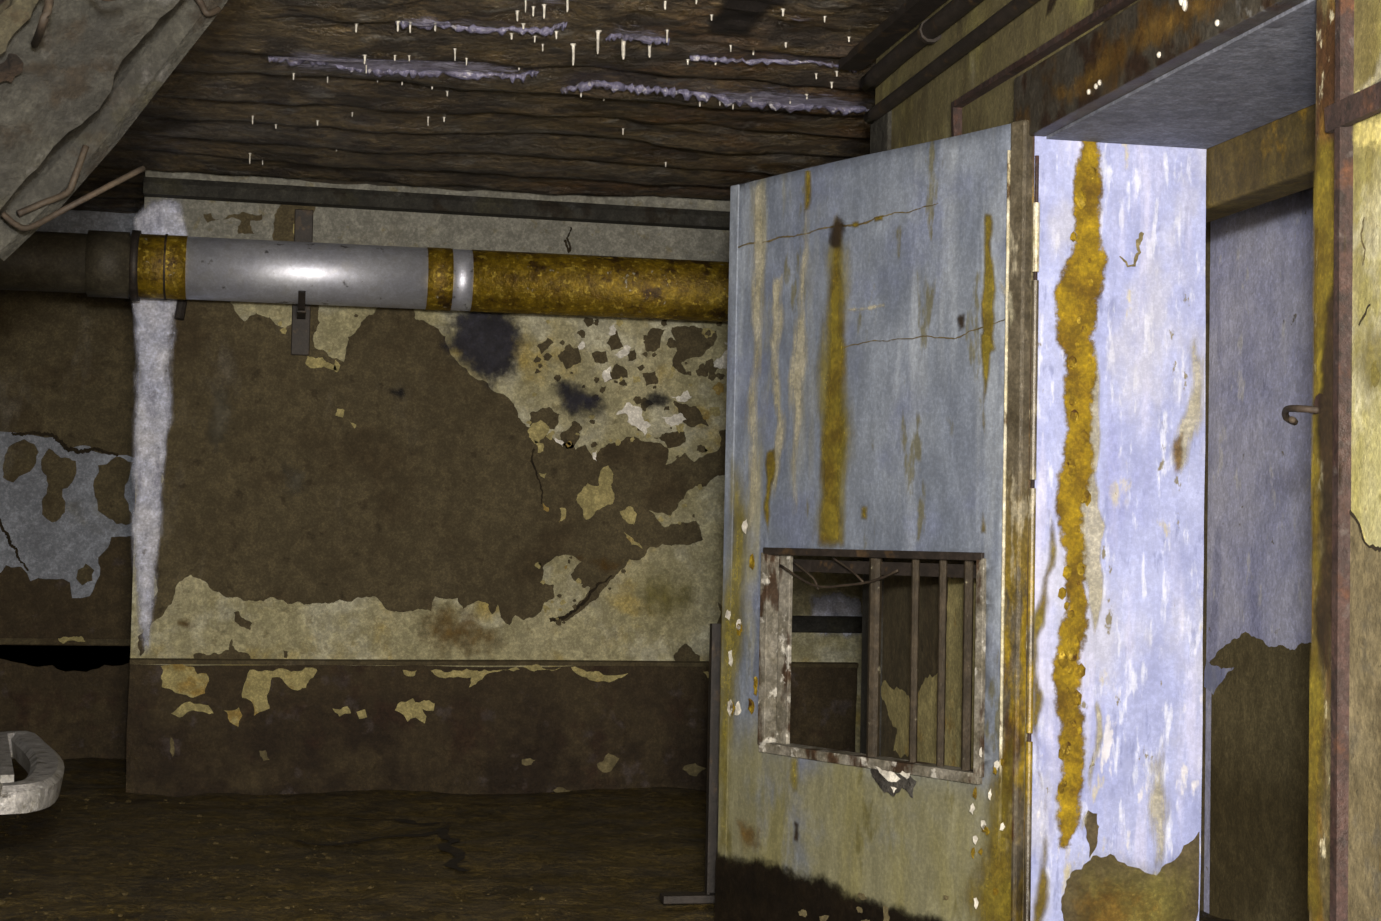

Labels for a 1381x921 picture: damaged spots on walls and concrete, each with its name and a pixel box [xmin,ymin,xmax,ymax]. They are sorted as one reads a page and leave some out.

efflorescence [268,53,539,84]
efflorescence [395,19,567,37]
water stain [605,29,670,46]
rust [820,218,858,545]
rust [981,215,995,393]
flaking render [0,290,726,671]
rust [1033,141,1108,921]
peeling [171,702,242,726]
water stain [714,853,942,921]
rust [970,747,1013,921]
flaking render [1061,632,1311,921]
flaking render [1348,509,1381,921]